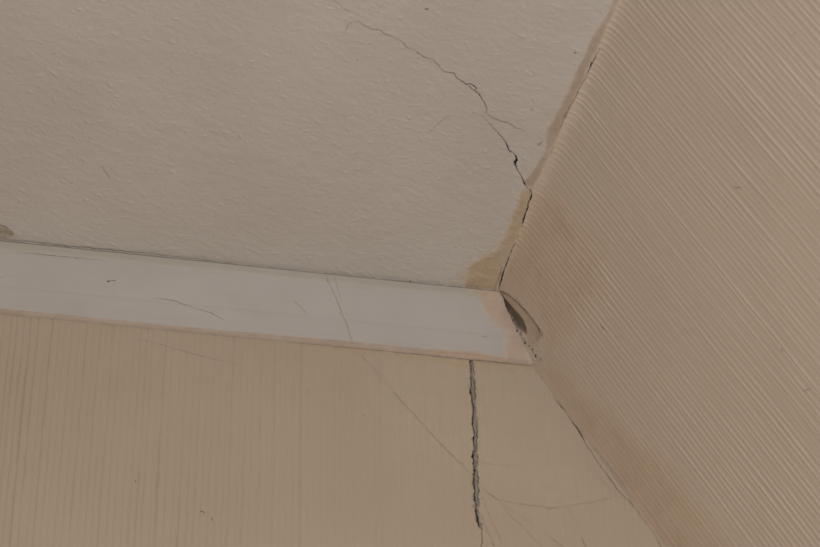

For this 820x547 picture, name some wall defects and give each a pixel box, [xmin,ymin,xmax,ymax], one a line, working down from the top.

crack [407,47,532,289]
crack [398,352,531,546]
crack [557,402,633,505]